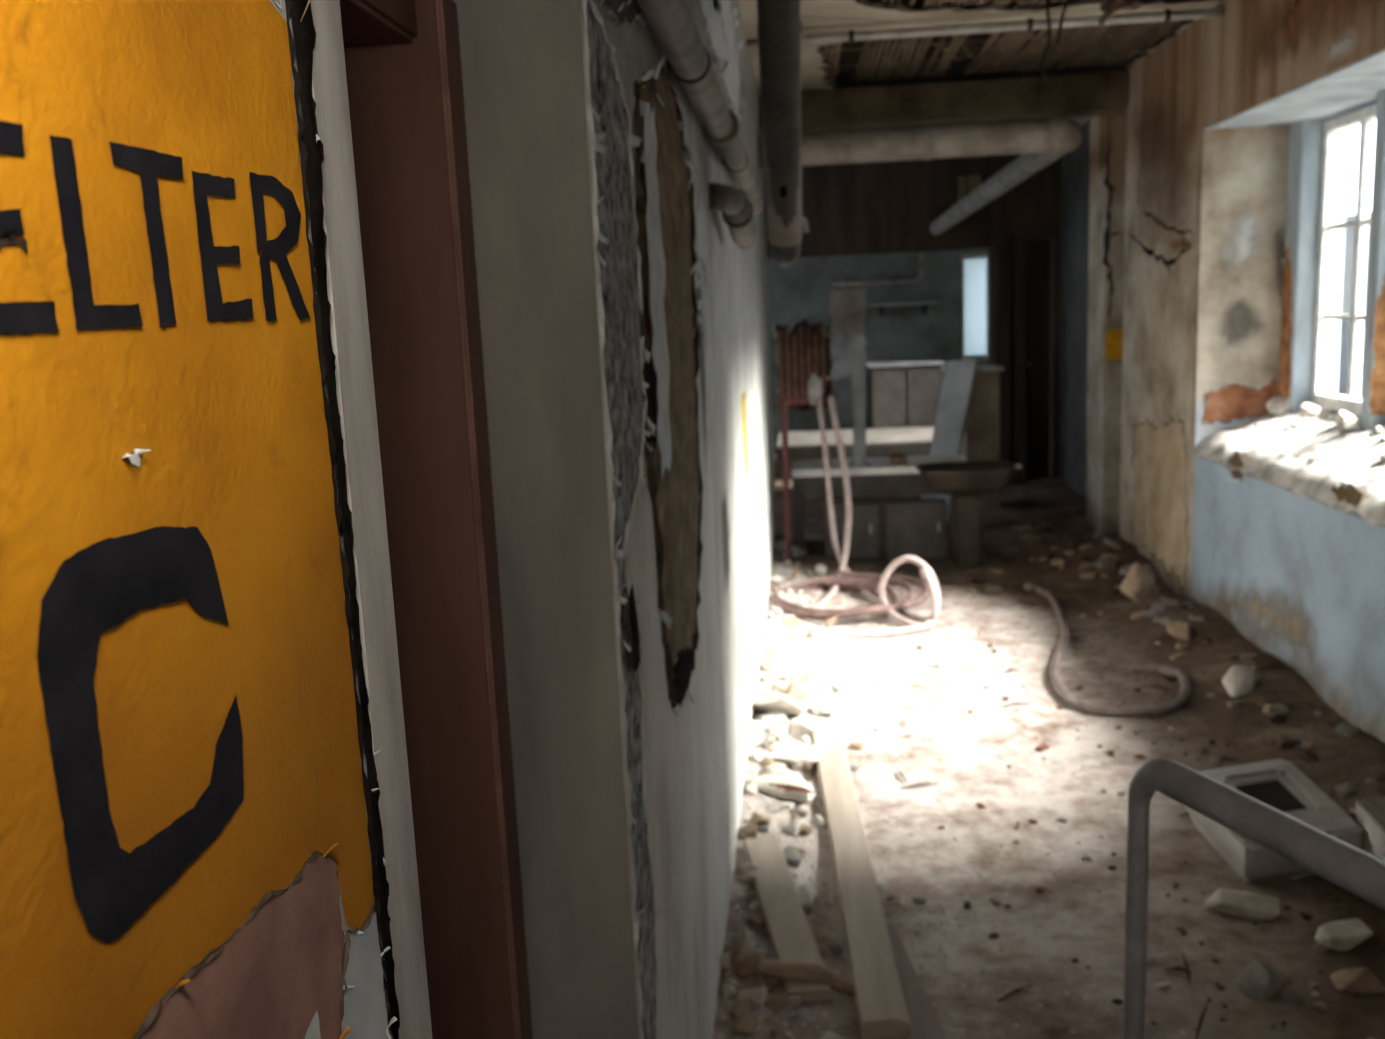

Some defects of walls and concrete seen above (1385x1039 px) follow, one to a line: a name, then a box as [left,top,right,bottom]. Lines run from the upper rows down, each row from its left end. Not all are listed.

crack [1100,138,1201,422]
peeling [582,0,708,1039]
peeling [1129,417,1189,592]
flaking render [1223,451,1244,482]
flaking render [1202,378,1279,424]
flaking render [1331,481,1362,507]
peeling [133,842,391,1039]